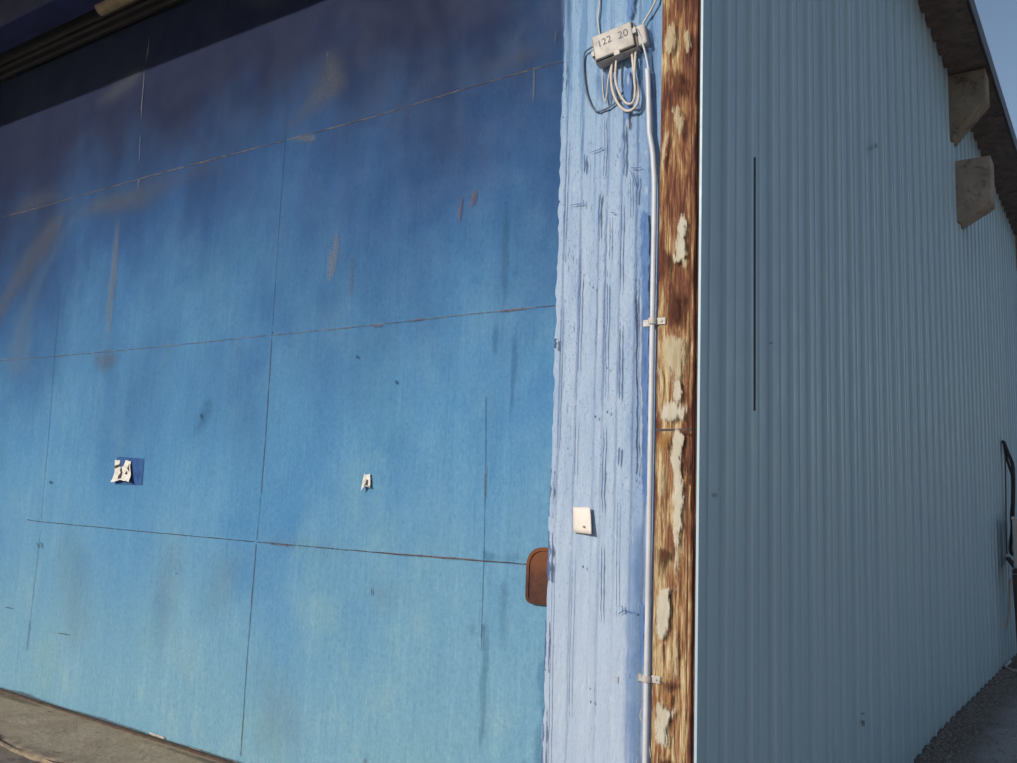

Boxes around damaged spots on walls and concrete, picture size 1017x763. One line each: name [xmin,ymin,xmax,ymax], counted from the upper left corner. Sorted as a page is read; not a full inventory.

peeling [665,22,689,55]
peeling [662,105,683,171]
rust [666,293,683,324]
damp [629,552,645,763]